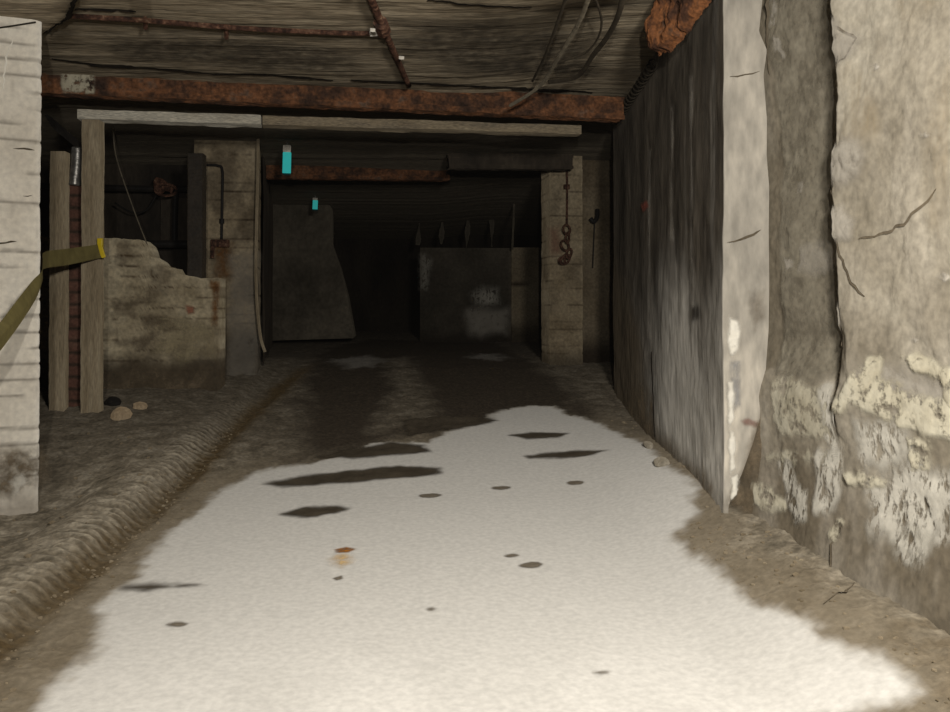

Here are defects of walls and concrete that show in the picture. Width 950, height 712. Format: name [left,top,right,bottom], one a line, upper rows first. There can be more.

crack [44,0,136,33]
crack [427,0,532,8]
crack [835,26,857,88]
crack [51,58,593,93]
crack [835,189,936,296]
peeling [843,472,886,488]
peeling [750,482,787,513]
peeling [828,519,844,541]